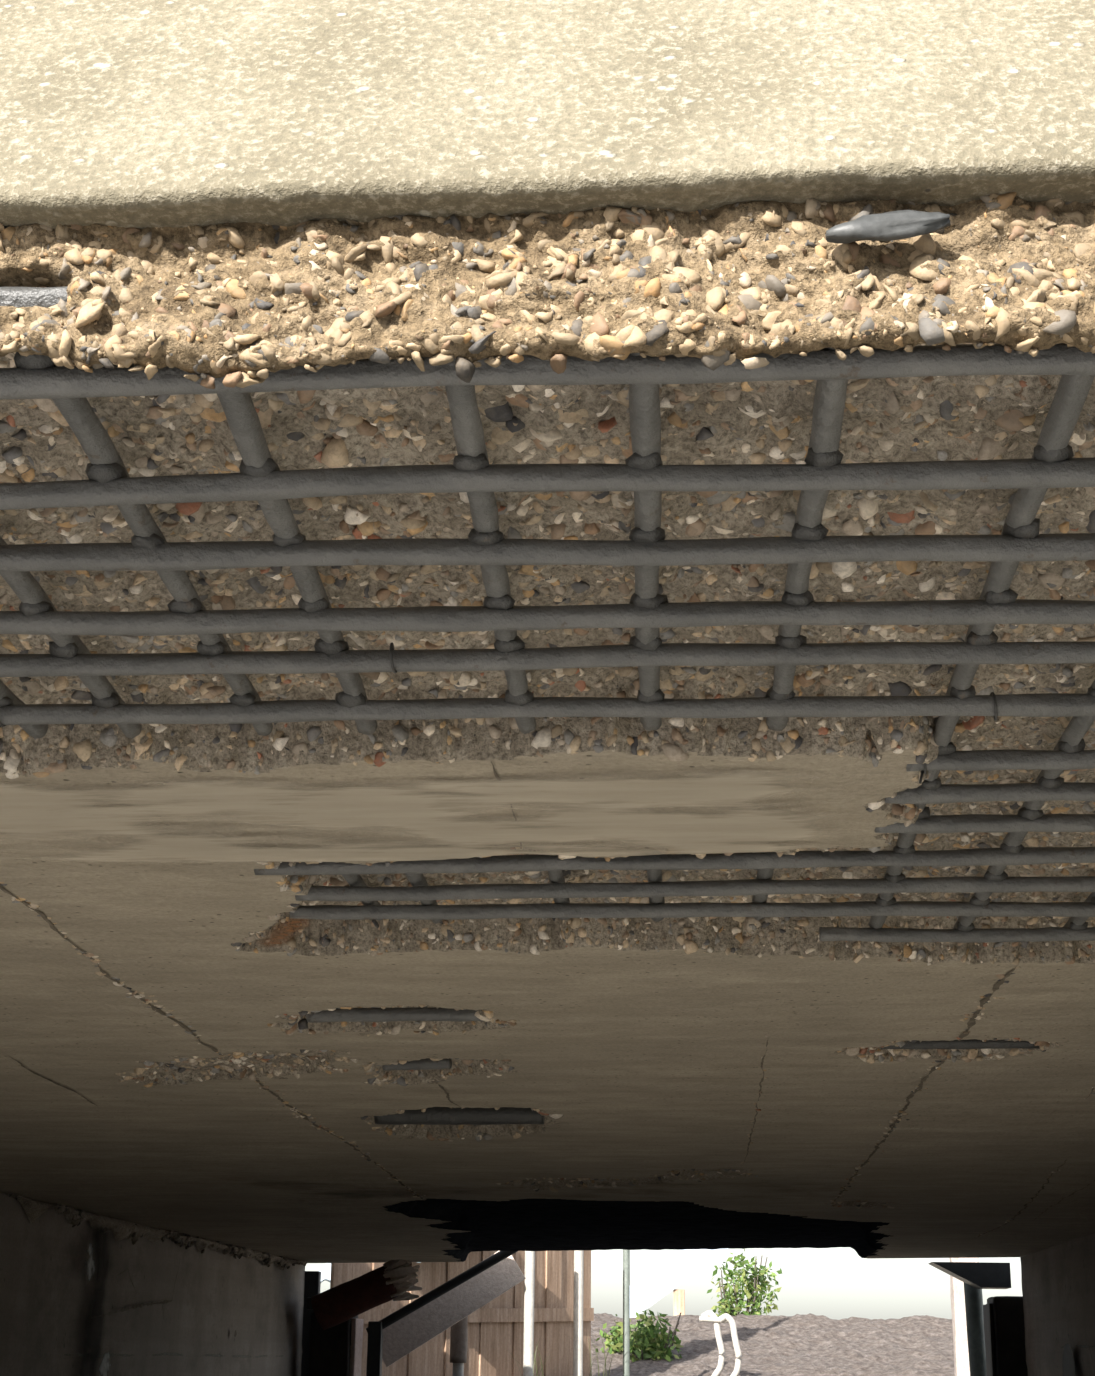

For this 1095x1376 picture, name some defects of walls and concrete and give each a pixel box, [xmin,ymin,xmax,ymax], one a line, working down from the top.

spalling [0,192,1095,483]
spalling [0,505,134,545]
spalling [287,492,474,540]
spalling [661,490,801,540]
spalling [821,489,1018,536]
spalling [808,561,991,602]
spalling [0,716,1095,966]
crack [0,880,222,1055]
crack [9,1056,97,1106]
crack [829,965,1020,1205]
crack [255,1078,426,1201]
spalling [382,1199,890,1262]